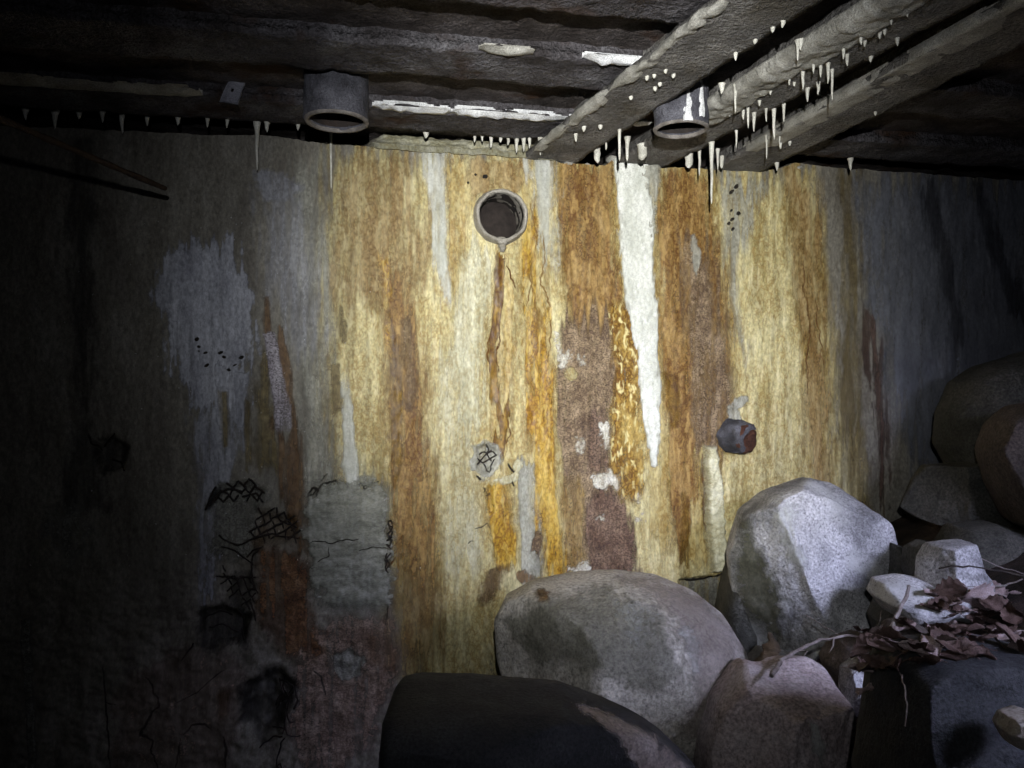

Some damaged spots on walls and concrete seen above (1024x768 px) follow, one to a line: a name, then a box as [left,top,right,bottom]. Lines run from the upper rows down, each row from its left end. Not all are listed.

water stain [683,0,929,125]
spalling [205,478,301,641]
crack [307,473,379,497]
rust [330,149,441,596]
spalling [470,441,523,486]
water stain [317,0,729,676]
rust [447,155,640,576]
rust [655,167,736,571]
water stain [700,164,866,542]